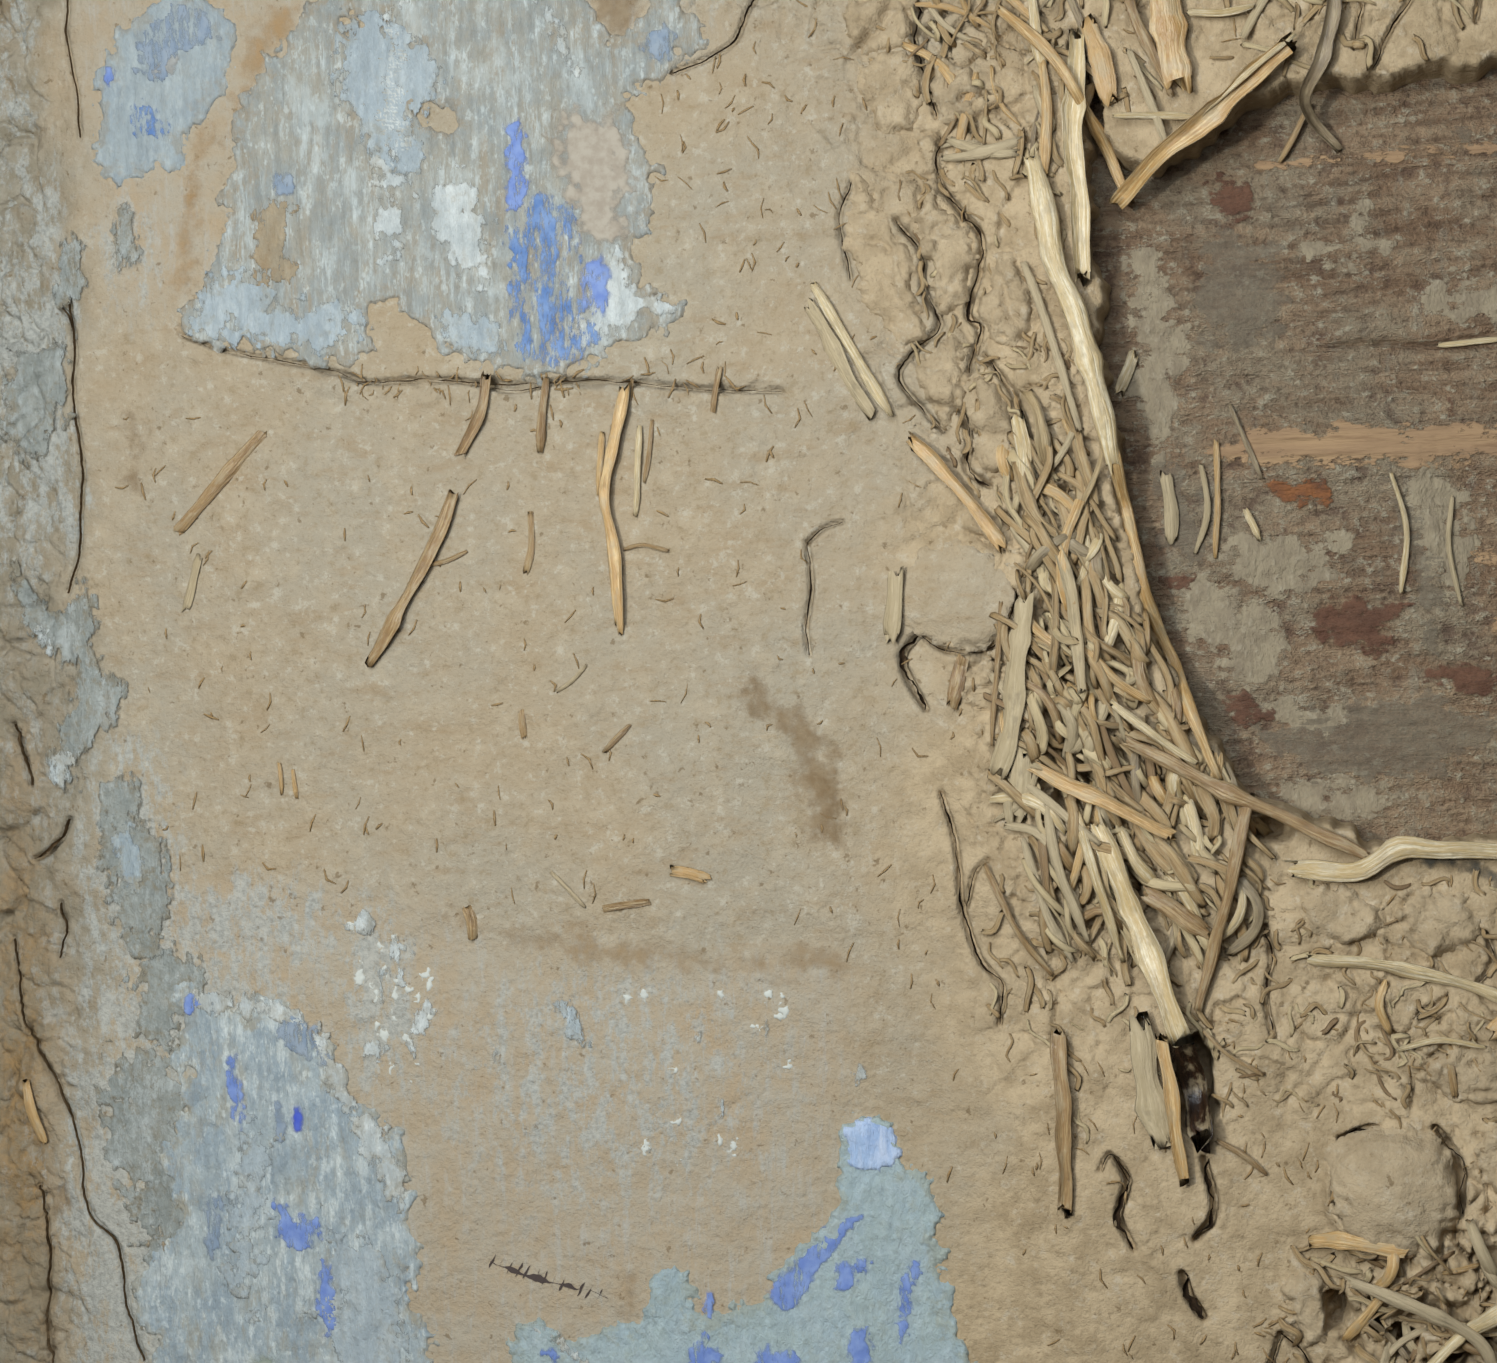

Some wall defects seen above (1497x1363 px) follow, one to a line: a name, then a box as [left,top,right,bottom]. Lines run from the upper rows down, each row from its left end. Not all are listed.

peeling [91,0,709,386]
spalling [841,171,1032,473]
crack [182,336,782,392]
crack [14,724,34,785]
crack [34,819,71,859]
crack [59,903,68,958]
peeling [9,558,440,1363]
spalling [1301,882,1481,958]
spalling [1414,1043,1497,1105]
crack [14,938,145,1363]
peeling [506,1112,978,1363]
spalling [1280,1269,1344,1349]